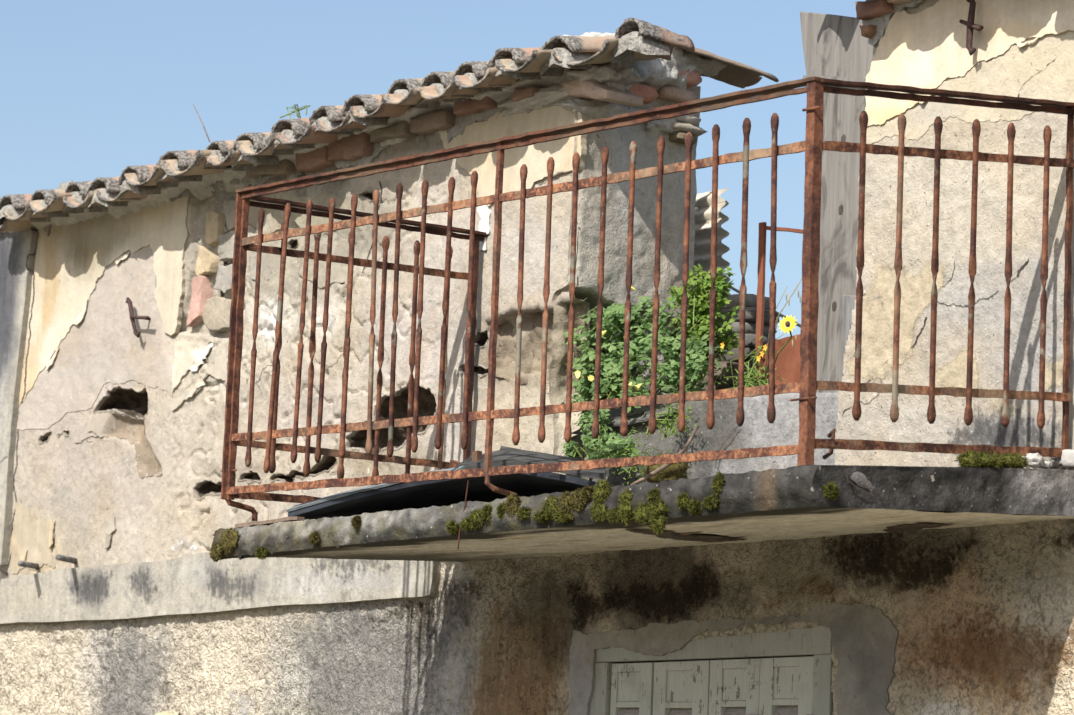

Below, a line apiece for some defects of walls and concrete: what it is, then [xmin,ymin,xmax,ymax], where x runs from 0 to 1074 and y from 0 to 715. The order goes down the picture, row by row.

flaking render [866,31,1074,144]
flaking render [18,245,228,445]
corrosion [763,334,800,385]
flaking render [10,501,56,574]